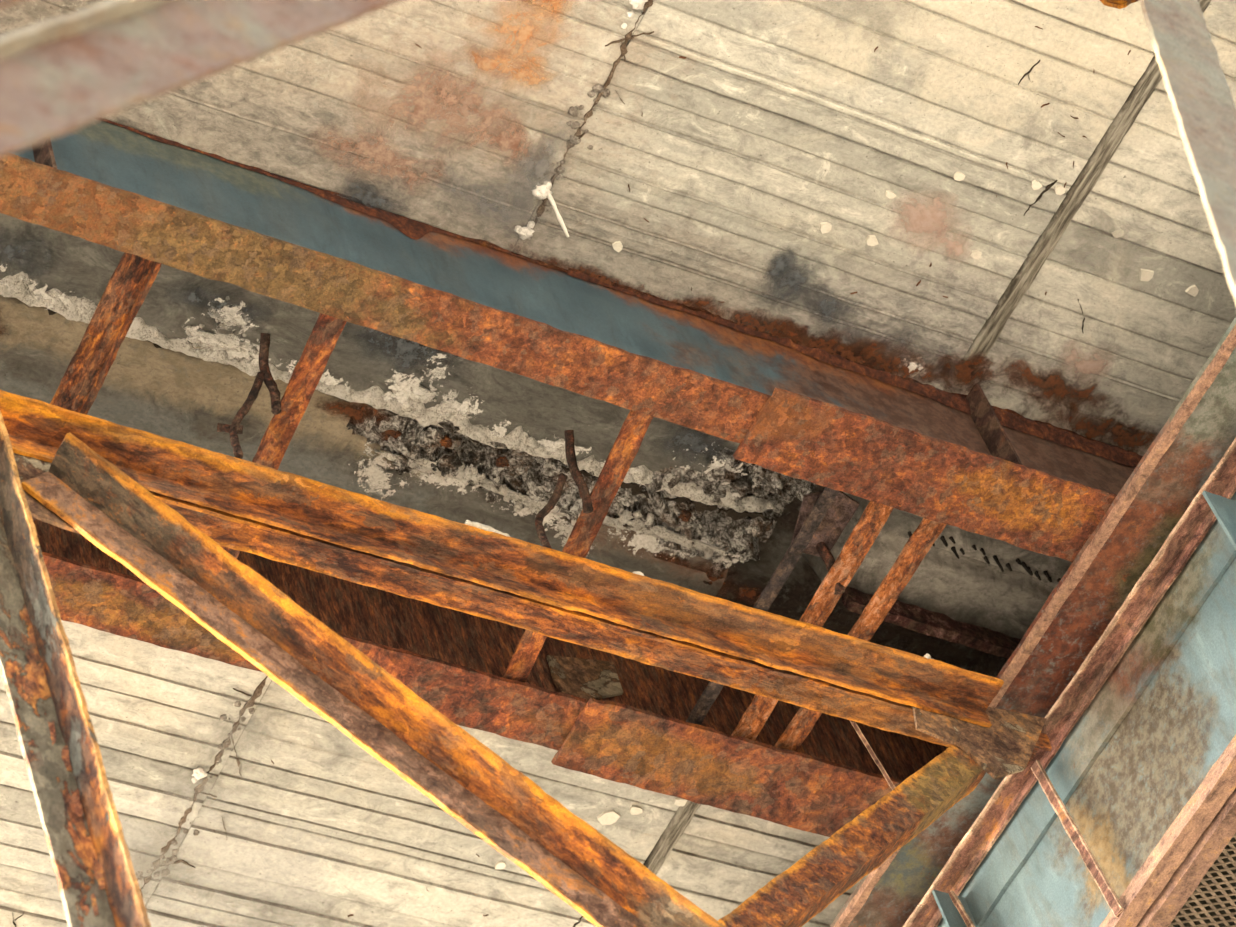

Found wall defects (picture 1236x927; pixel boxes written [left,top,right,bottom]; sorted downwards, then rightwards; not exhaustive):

corrosion [315,0,566,191]
crack [531,0,654,230]
leakage [0,230,97,323]
leakage [126,287,297,383]
corrosion [317,401,402,441]
leakage [315,327,606,477]
spalling [346,407,598,521]
leakage [623,428,777,513]
corrosion [654,553,761,604]
spalling [607,447,815,581]
corrosion [519,250,1158,454]
crack [136,676,268,897]